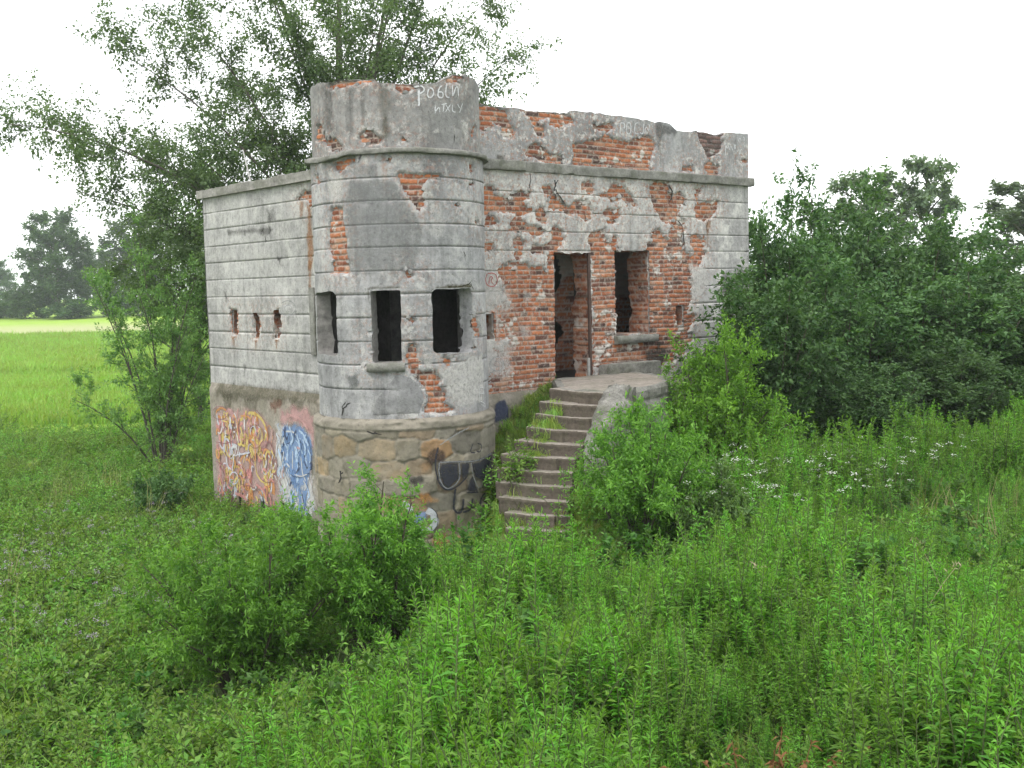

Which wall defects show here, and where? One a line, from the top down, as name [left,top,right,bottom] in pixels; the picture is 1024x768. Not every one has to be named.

spalling [317,125,441,211]
spalling [471,106,514,143]
spalling [520,110,654,170]
spalling [682,132,728,175]
spalling [329,207,351,274]
spalling [469,165,717,394]
spalling [406,344,458,413]